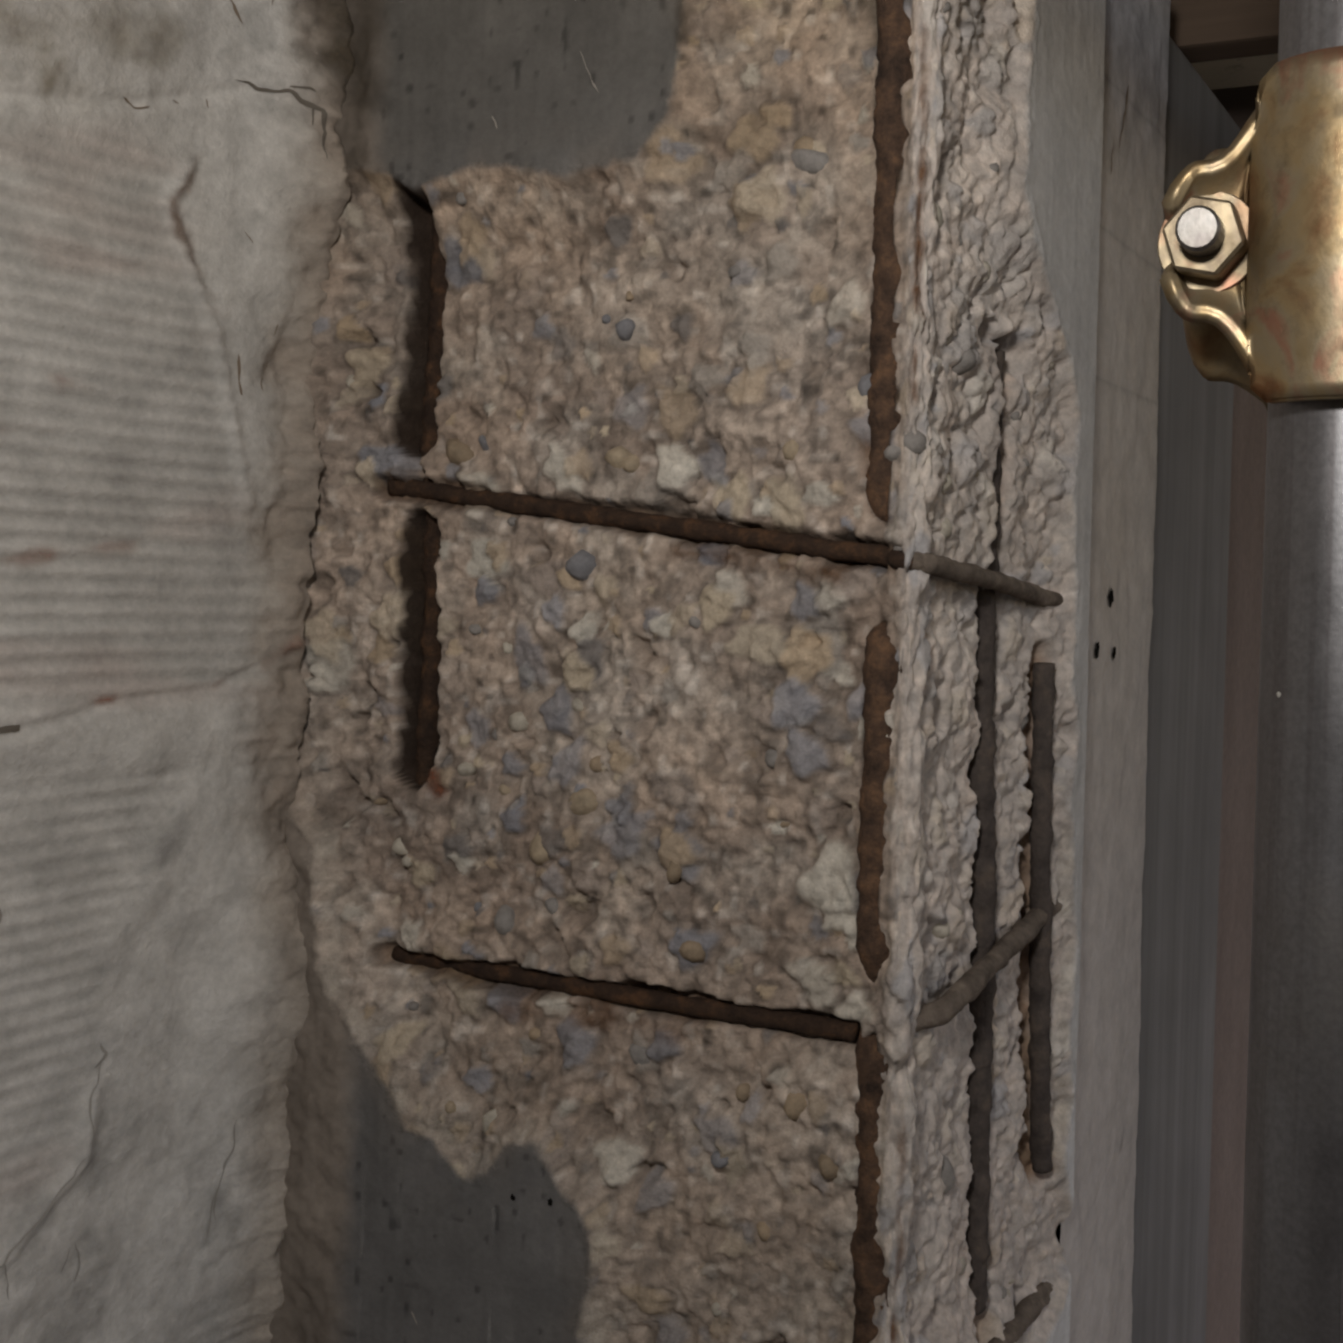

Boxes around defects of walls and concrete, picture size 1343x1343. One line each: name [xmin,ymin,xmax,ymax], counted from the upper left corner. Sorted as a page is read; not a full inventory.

crack [123,97,208,109]
crack [238,80,328,159]
spalling [286,0,1083,1343]
crack [0,1043,108,1300]